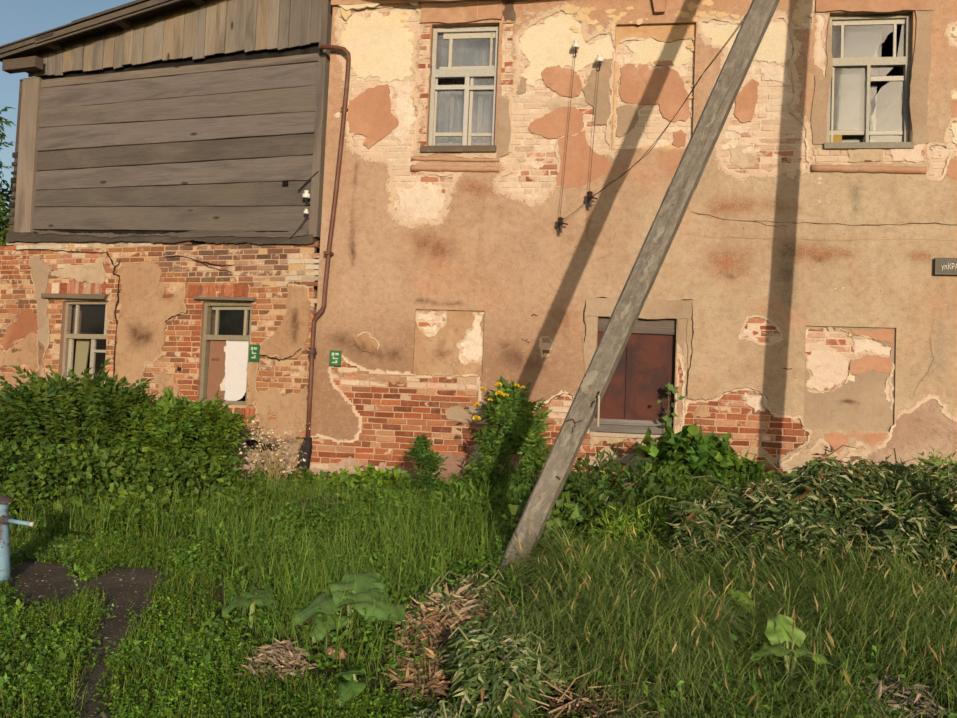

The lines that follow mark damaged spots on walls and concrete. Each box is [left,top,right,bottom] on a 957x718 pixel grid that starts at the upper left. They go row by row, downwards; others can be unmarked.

flaking render [334,0,957,231]
crack [658,34,957,248]
crack [17,249,120,378]
flaking render [225,310,526,483]
flaking render [532,370,663,490]
flaking render [738,315,784,346]
flaking render [673,327,957,480]